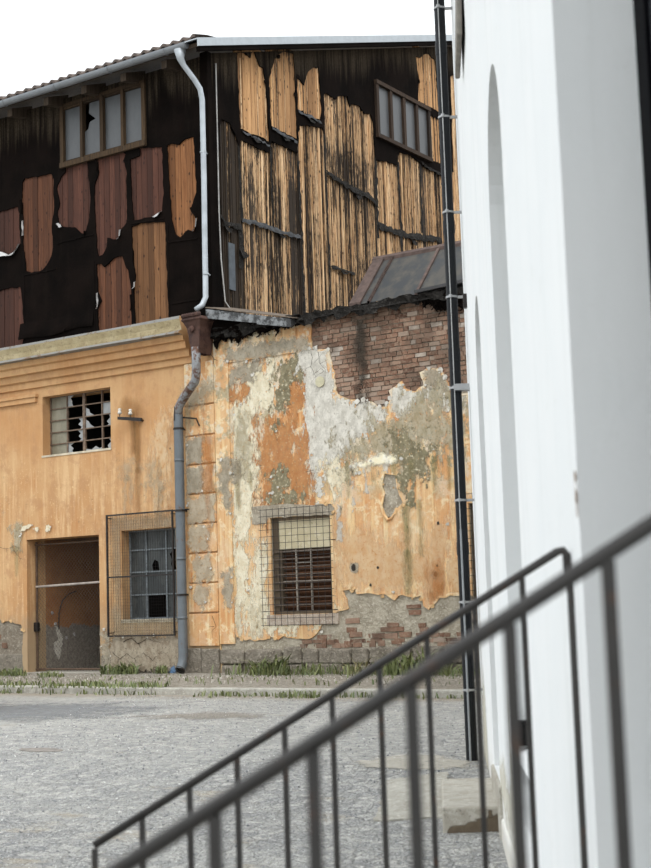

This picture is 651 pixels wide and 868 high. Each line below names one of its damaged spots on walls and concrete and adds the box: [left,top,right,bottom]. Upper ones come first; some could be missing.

peeling [233,49,323,147]
peeling [0,137,197,331]
peeling [238,218,302,269]
spalling [458,307,467,384]
leakage [332,319,453,532]
spalling [222,301,461,653]
spalling [0,620,25,654]